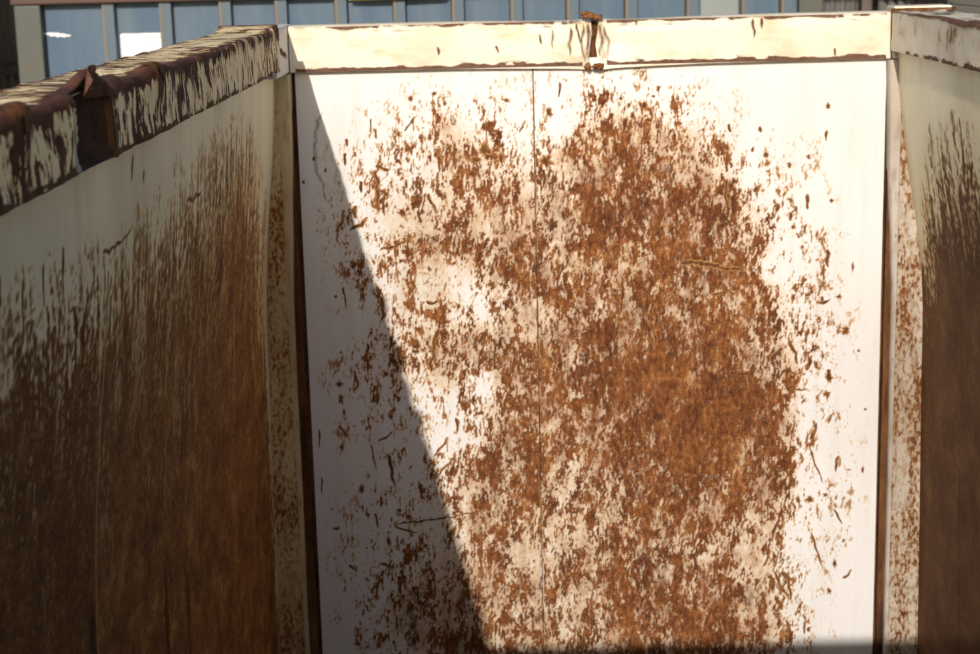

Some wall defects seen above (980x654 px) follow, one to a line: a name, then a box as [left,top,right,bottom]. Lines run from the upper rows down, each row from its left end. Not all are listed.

rust [408,21,580,43]
rust [606,9,980,72]
rust [0,69,306,654]
rust [295,46,886,654]
rust [887,105,980,654]